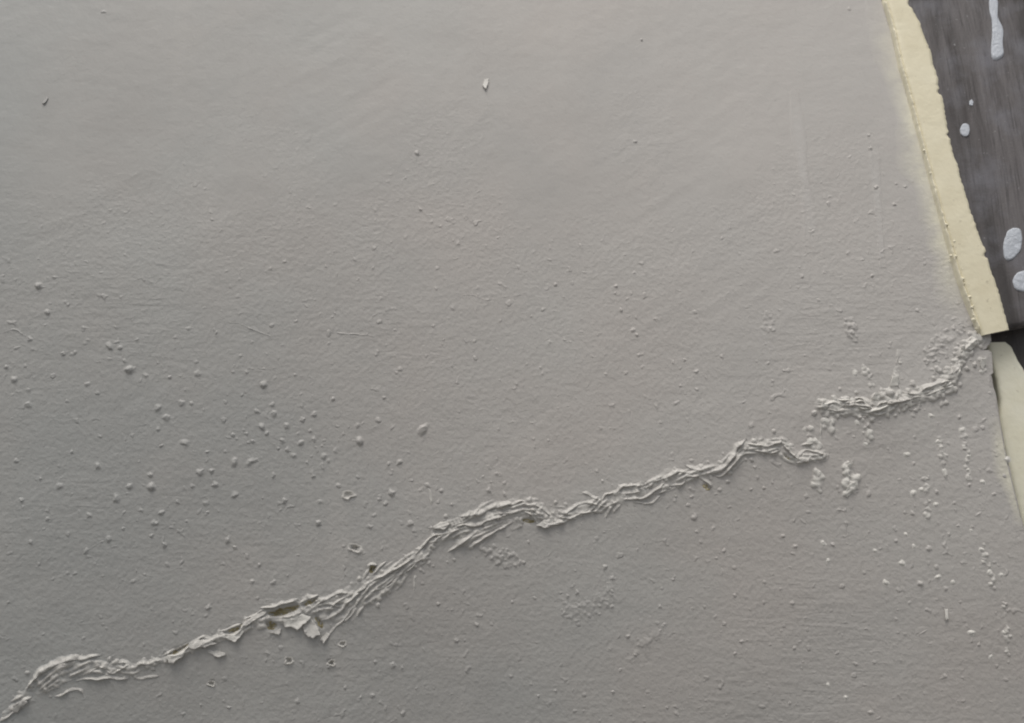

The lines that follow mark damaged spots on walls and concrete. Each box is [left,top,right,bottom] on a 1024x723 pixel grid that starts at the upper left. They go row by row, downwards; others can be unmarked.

crack [0,329,991,721]